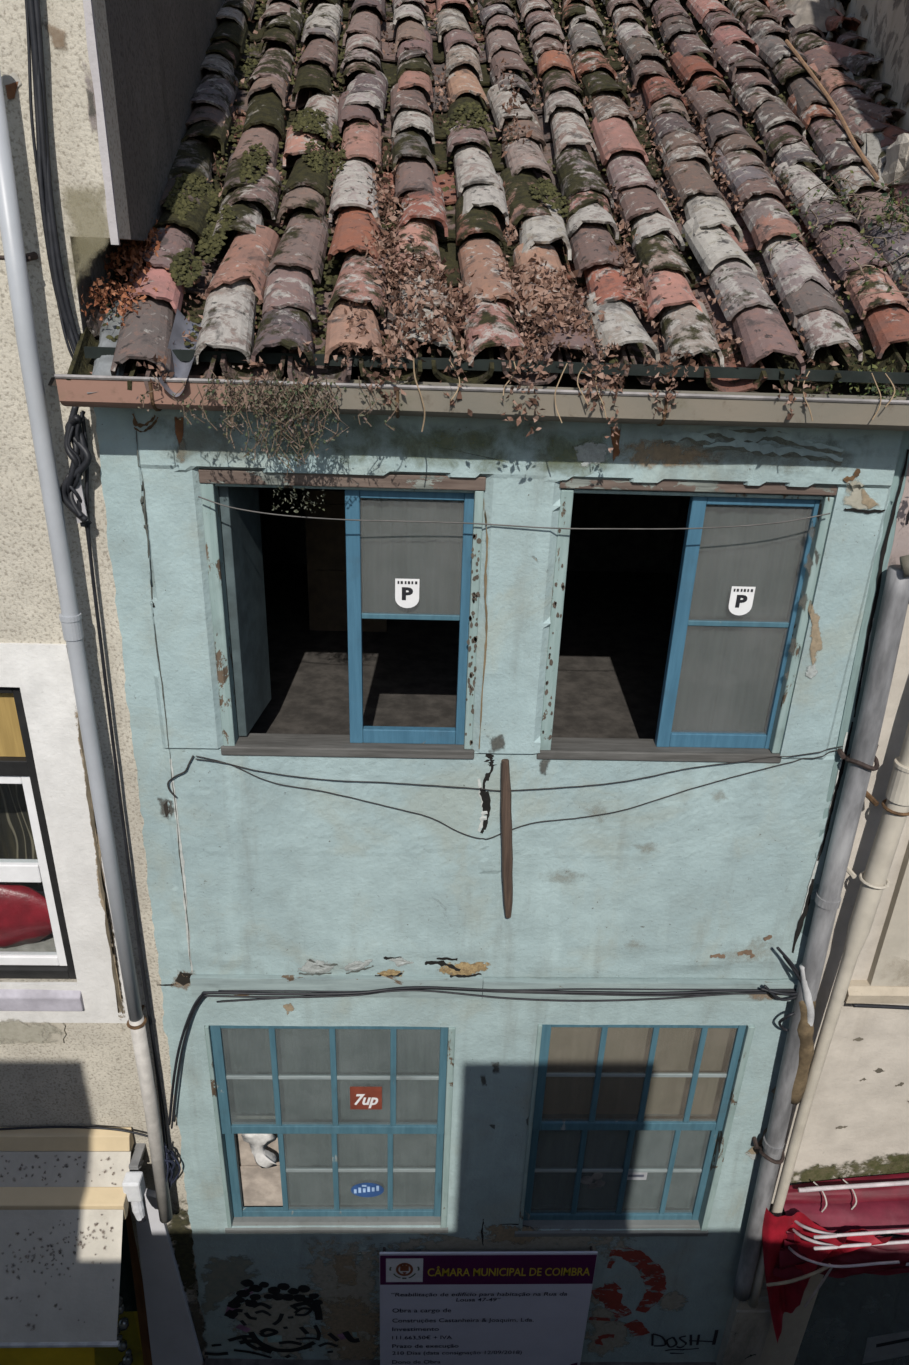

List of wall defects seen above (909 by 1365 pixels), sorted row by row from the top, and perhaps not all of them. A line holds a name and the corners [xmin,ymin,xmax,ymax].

spalling [816,0,909,141]
peeling [465,501,488,749]
crack [792,449,909,953]
crack [478,754,497,834]
flaking render [297,956,490,978]
peeling [201,1219,634,1360]